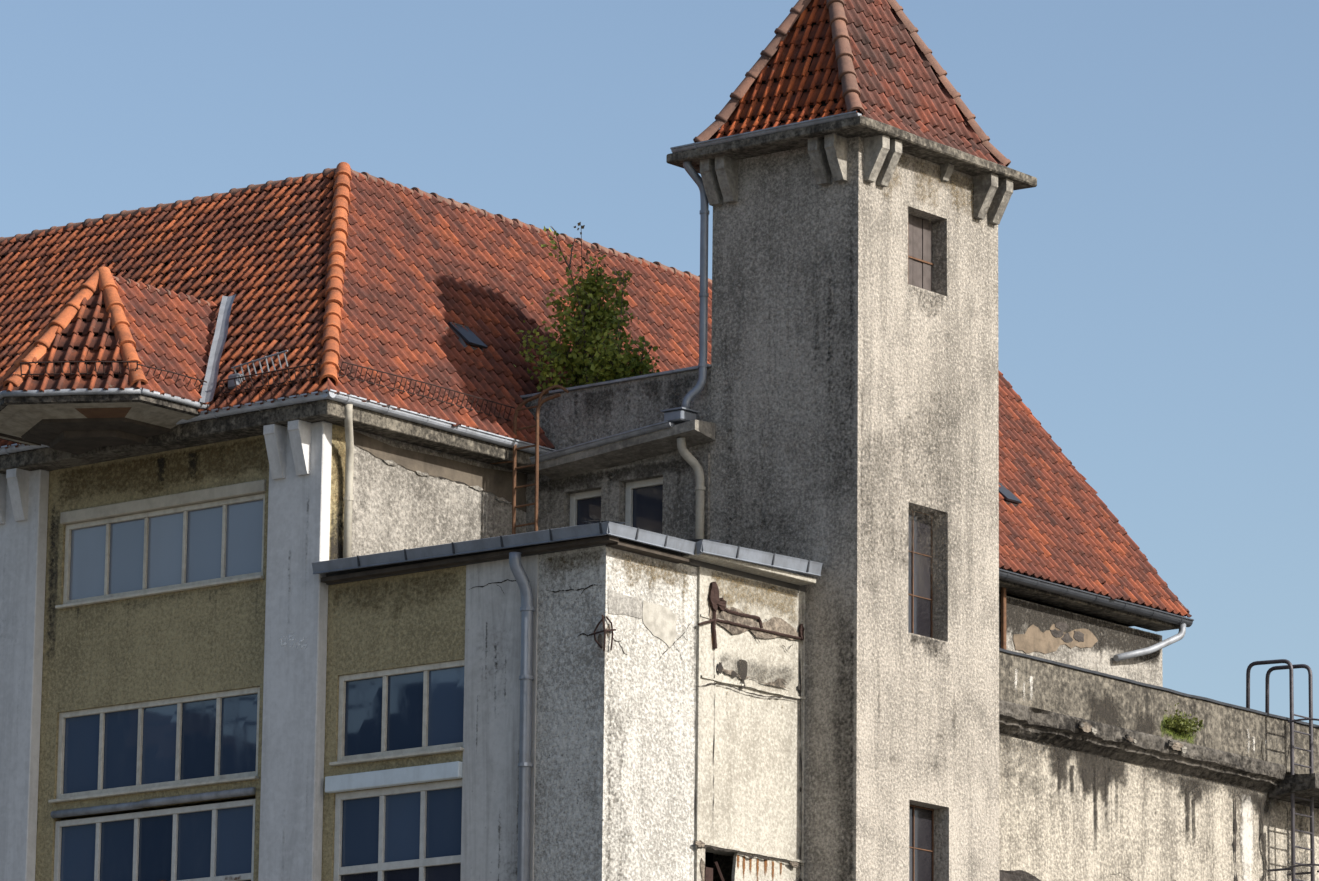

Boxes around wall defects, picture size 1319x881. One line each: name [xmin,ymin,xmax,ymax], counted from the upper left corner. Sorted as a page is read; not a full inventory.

corrosion [705,861,724,881]
spalling [694,840,803,881]
leakage [999,733,1128,843]
leakage [1148,766,1308,881]